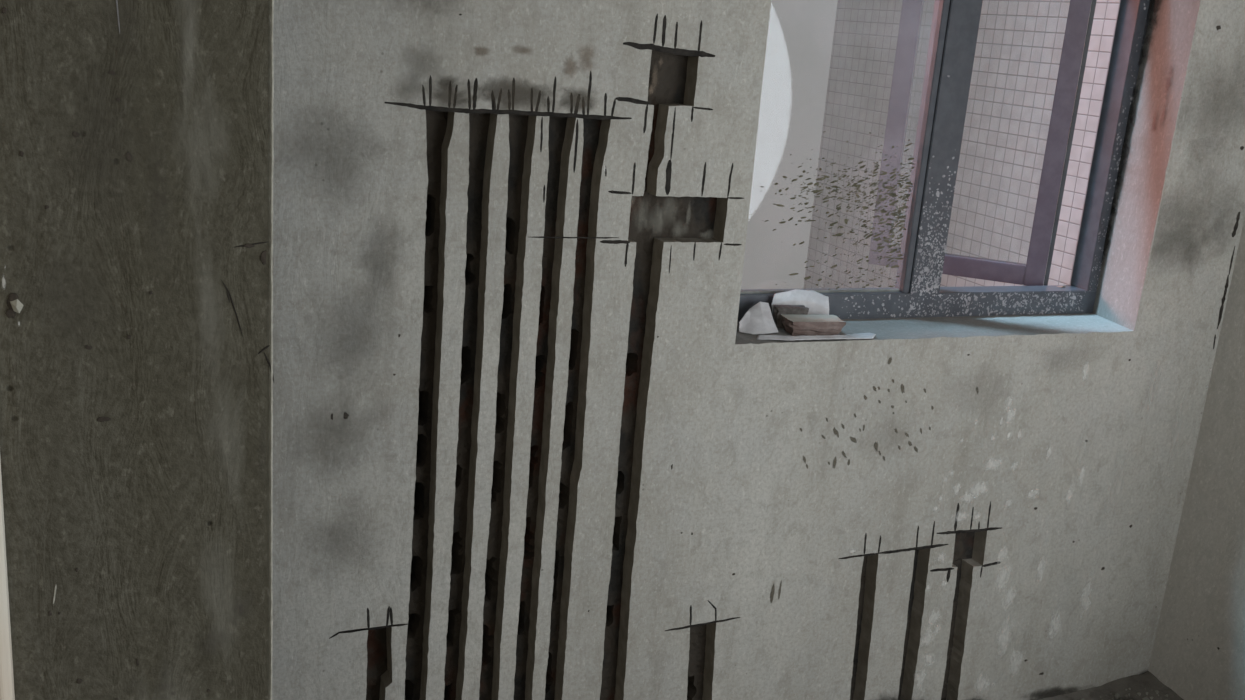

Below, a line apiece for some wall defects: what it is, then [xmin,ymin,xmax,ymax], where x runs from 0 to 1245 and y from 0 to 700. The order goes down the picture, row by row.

crack [1213,212,1240,349]